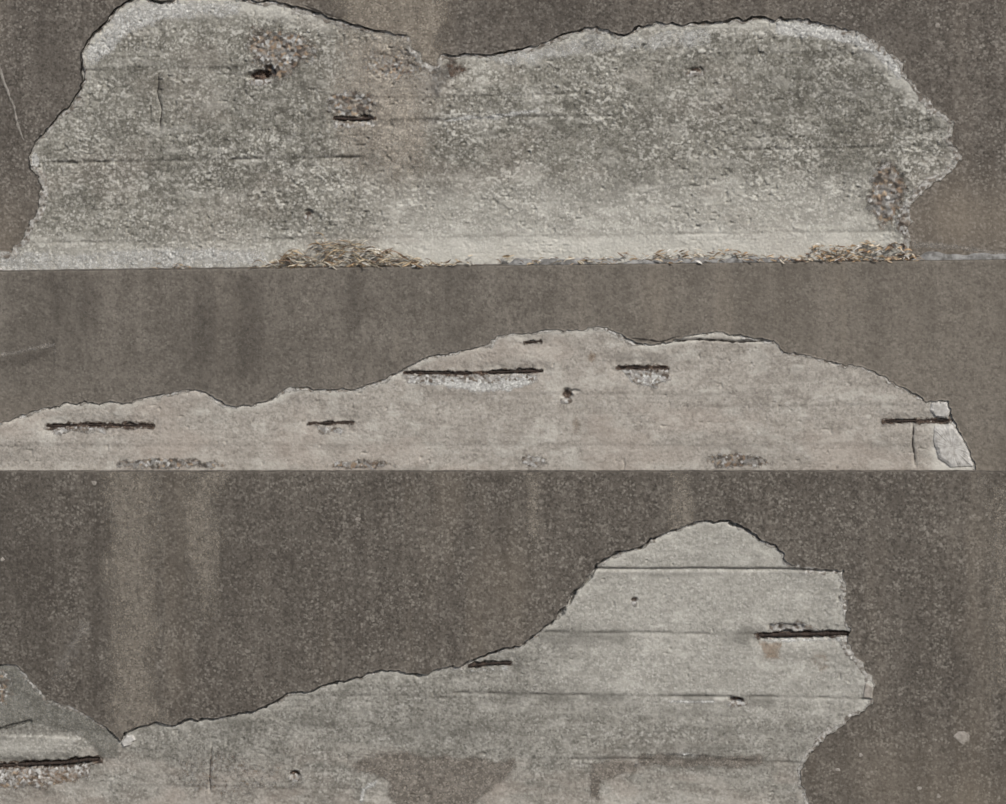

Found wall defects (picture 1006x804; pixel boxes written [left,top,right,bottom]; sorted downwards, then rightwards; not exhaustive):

spalling [0,0,963,270]
spalling [0,326,976,485]
water stain [352,751,516,804]
spalling [0,519,875,804]
spalling [953,731,970,745]